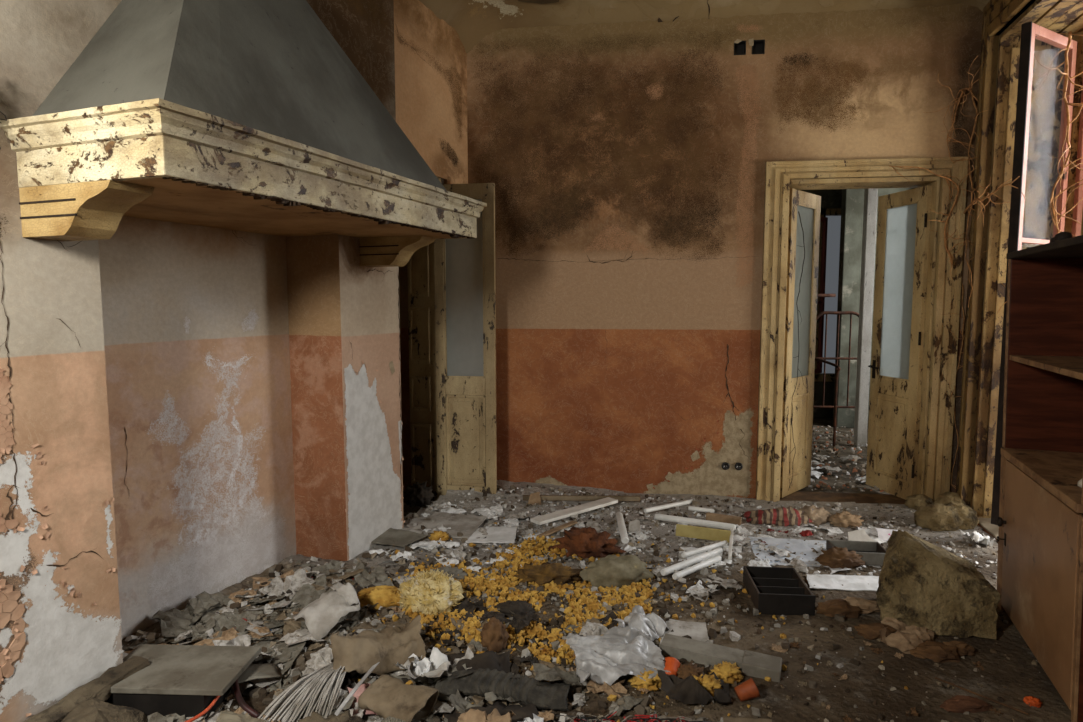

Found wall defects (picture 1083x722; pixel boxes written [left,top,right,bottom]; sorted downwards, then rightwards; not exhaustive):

peeling [471,0,524,19]
water stain [395,26,755,261]
water stain [771,49,881,134]
crack [0,242,53,520]
peeling [0,369,124,717]
water stain [145,346,288,615]
peeling [344,361,405,560]
flaking render [644,405,758,499]
crack [725,344,749,458]